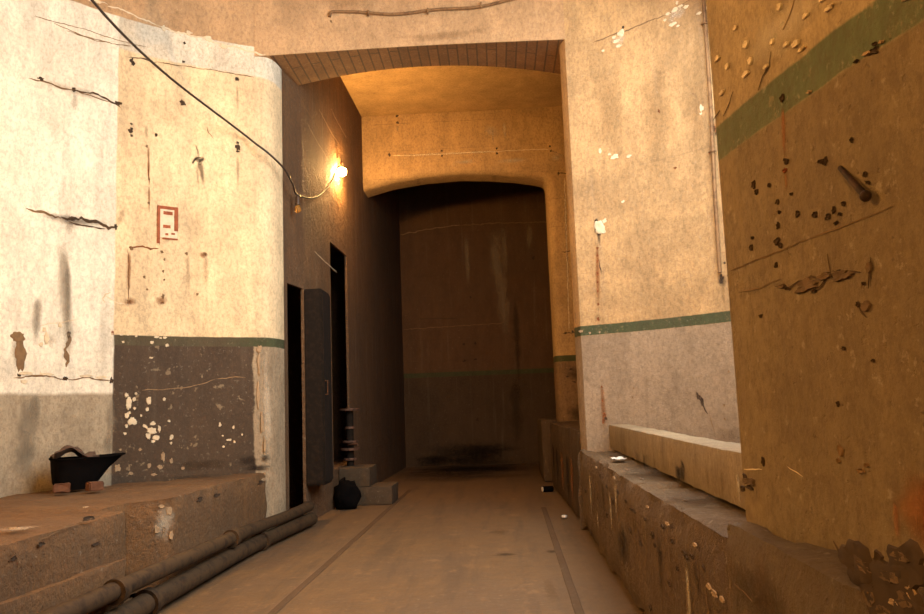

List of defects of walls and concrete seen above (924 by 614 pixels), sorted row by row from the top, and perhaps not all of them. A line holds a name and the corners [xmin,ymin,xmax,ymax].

peeling [741,40,753,78]
crack [15,372,114,384]
peeling [123,392,185,476]